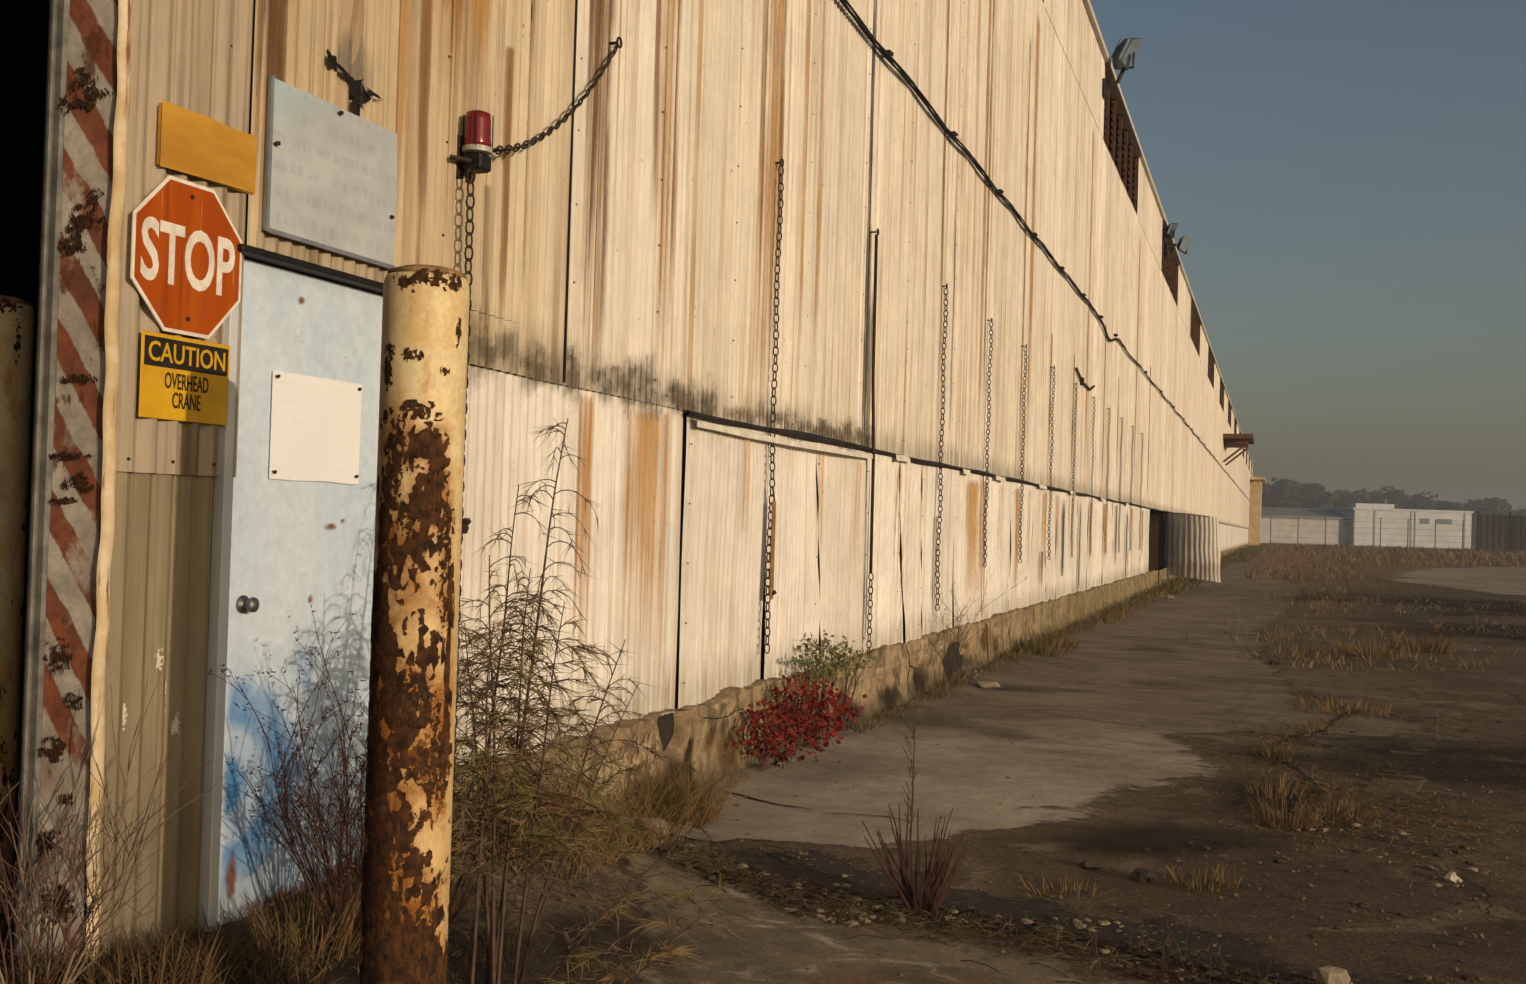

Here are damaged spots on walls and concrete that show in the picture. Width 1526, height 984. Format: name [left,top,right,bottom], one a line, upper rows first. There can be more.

corrosion [575,402,593,573]
corrosion [626,415,669,580]
spalling [915,637,982,679]
crack [1246,684,1526,930]